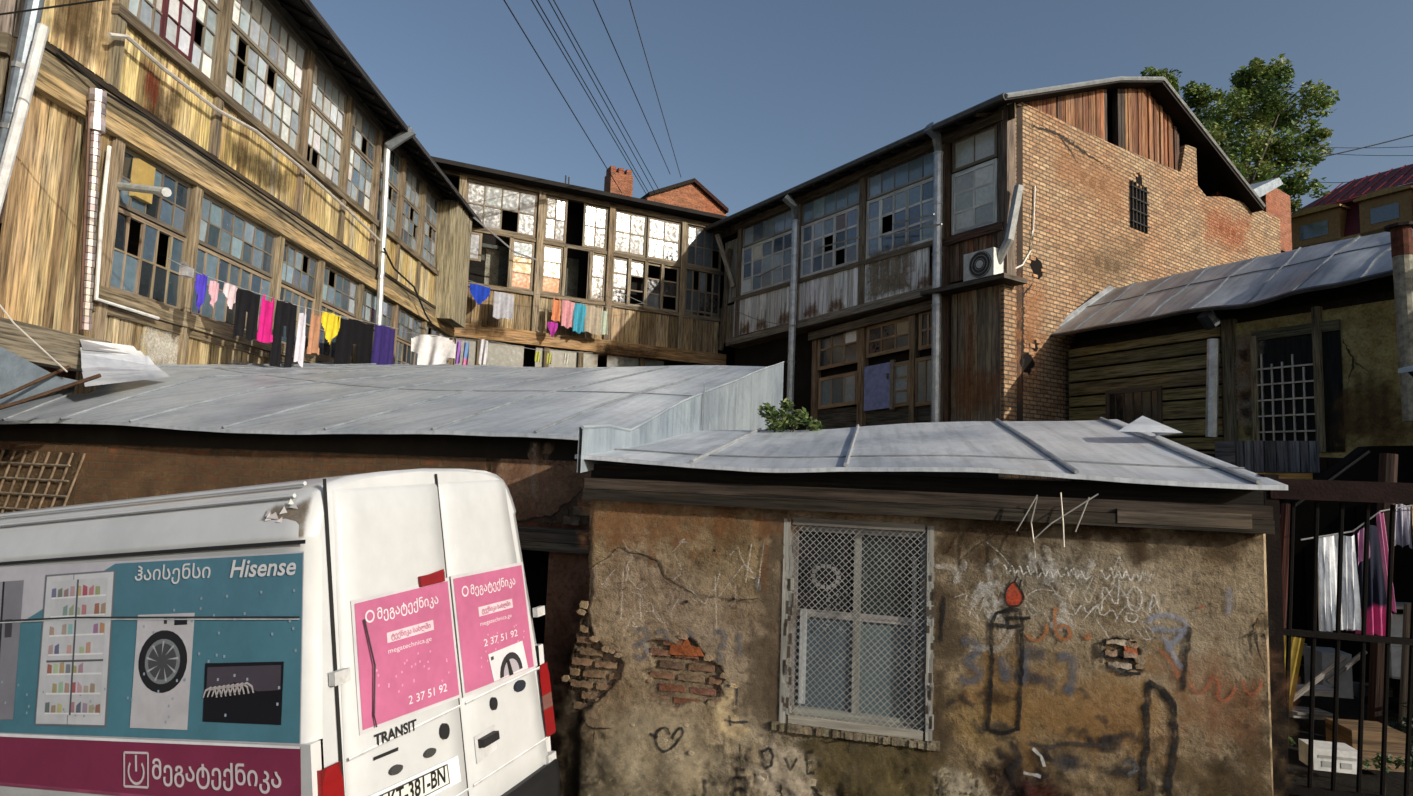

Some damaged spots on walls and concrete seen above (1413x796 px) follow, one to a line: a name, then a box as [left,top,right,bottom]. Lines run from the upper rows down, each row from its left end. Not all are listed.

crack [1031,125,1111,169]
crack [586,546,763,602]
spalling [561,601,623,711]
spalling [1099,637,1146,675]
spalling [645,634,748,739]